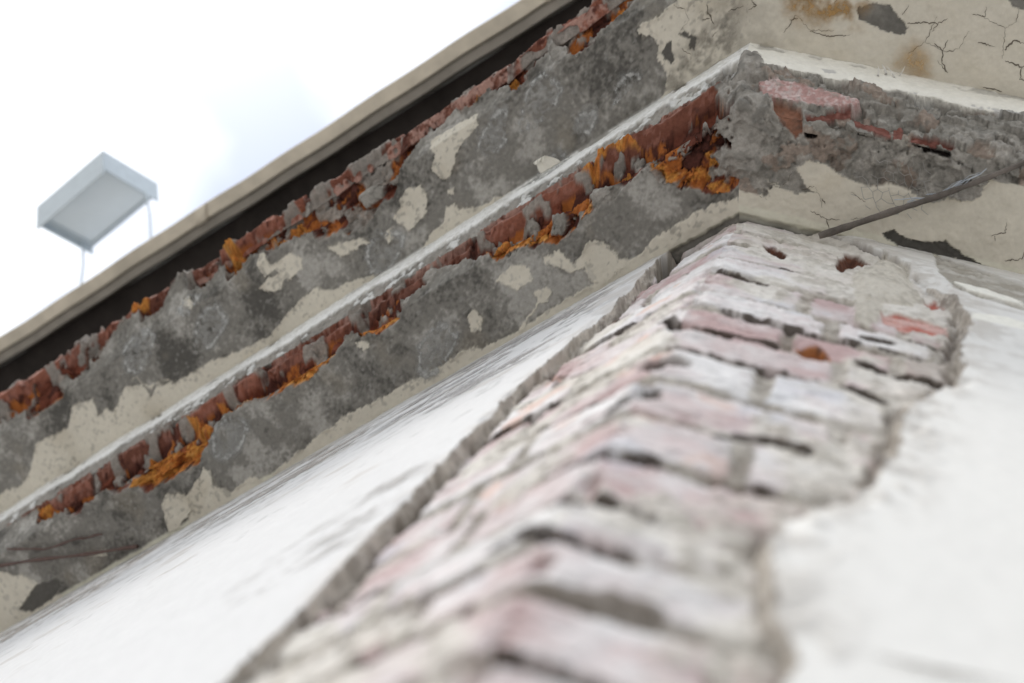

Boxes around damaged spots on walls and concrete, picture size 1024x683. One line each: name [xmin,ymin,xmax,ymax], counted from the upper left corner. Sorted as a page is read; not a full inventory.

peeling [0,571,64,633]
spalling [177,0,634,310]
spalling [161,196,739,683]
spalling [0,58,1024,524]
crack [786,15,849,37]
peeling [857,2,908,34]
spalling [748,229,1024,683]
crack [902,6,1024,92]